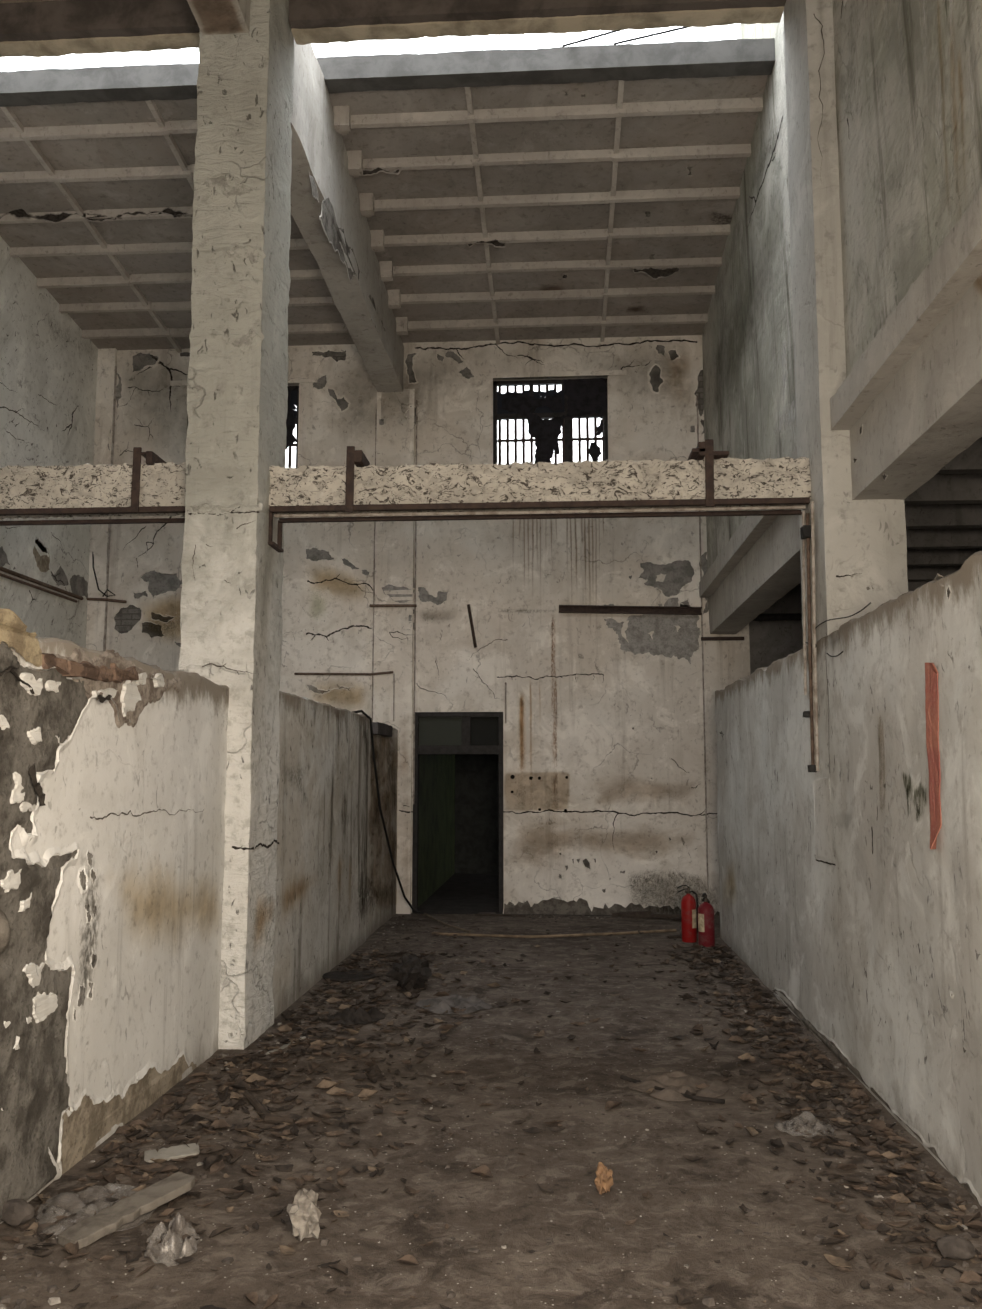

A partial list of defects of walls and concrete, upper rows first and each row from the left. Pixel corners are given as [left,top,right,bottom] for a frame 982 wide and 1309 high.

spalling [0,207,193,224]
spalling [309,172,386,335]
peeling [29,534,89,601]
crack [307,574,373,593]
crack [306,625,412,641]
peeling [602,551,709,666]
crack [471,639,604,699]
crack [90,809,203,820]
crack [503,758,717,841]
peeling [0,567,213,1222]
peeling [558,852,596,880]
spalling [503,870,697,916]